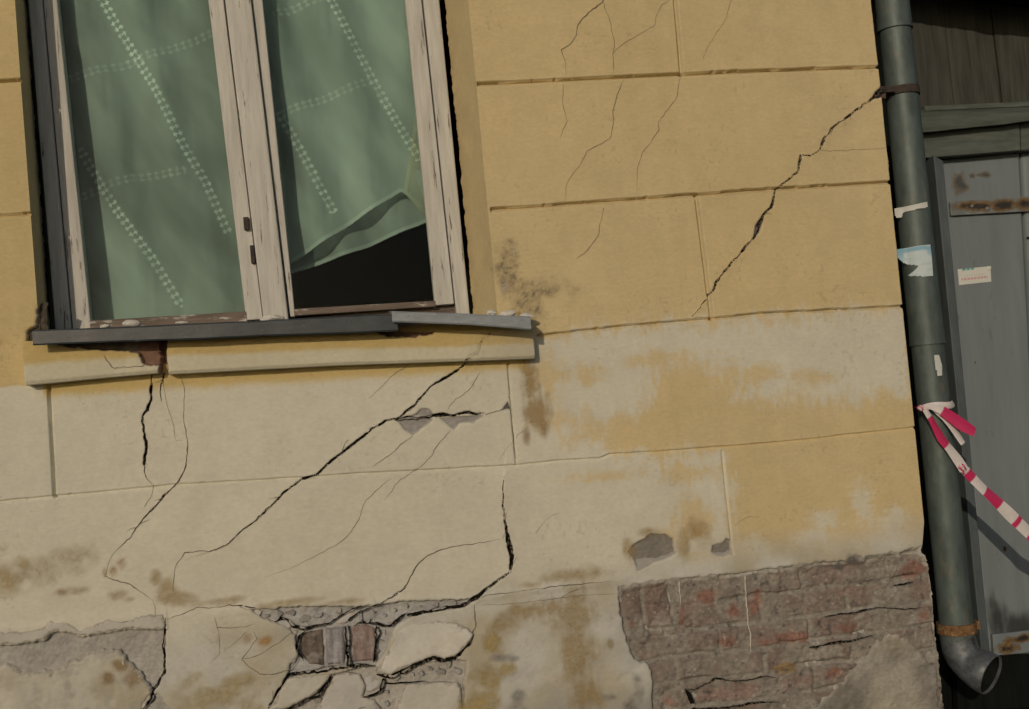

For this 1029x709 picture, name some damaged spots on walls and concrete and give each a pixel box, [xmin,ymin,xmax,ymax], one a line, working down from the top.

crack [560,0,665,190]
crack [637,80,680,178]
crack [692,86,889,316]
flaking render [397,409,480,431]
water stain [524,362,545,430]
crack [104,333,609,709]
flaking render [629,534,673,560]
flaking render [712,539,730,552]
flaking render [0,614,166,692]
flaking render [254,598,473,709]
flaking render [618,547,944,709]